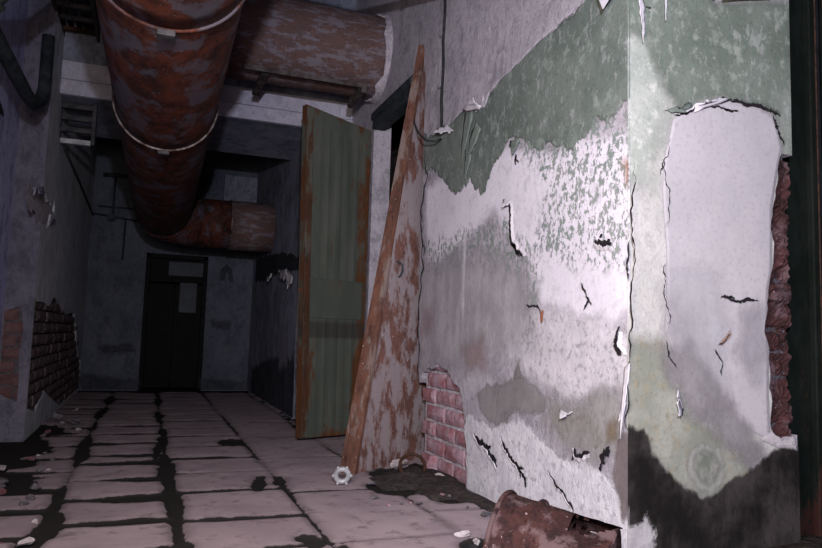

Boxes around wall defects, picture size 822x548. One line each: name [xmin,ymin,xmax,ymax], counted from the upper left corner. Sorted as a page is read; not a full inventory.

flaking render [0,298,80,411]
peeling [423,0,797,499]
crack [721,295,758,303]
crack [473,433,526,488]
peeling [421,365,628,548]
crack [547,470,573,512]
leakage [478,347,801,548]